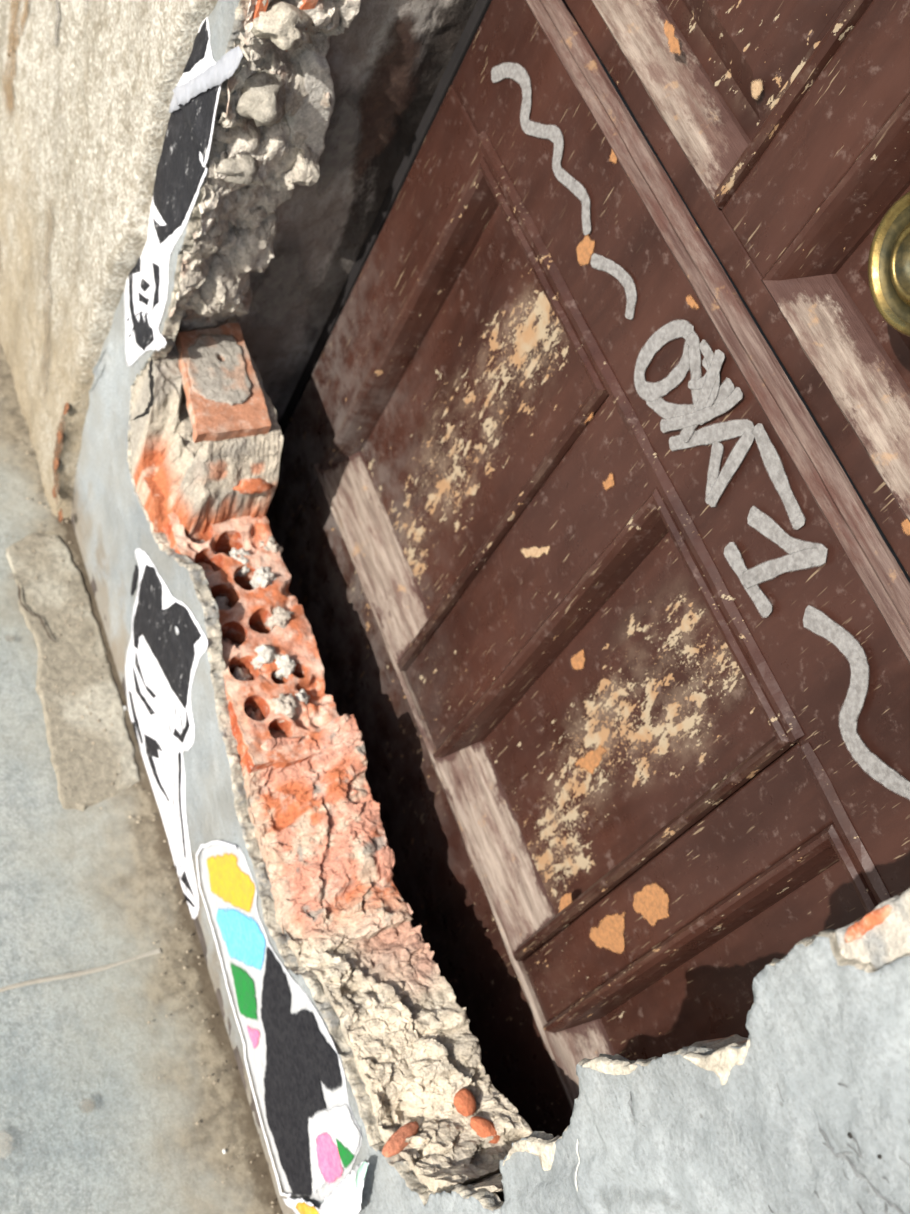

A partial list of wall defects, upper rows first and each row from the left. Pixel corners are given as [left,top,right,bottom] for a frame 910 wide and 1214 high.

peeling [664,20,681,54]
peeling [751,80,762,99]
peeling [576,234,595,265]
peeling [603,473,614,490]
spalling [129,0,557,1201]
peeling [571,650,585,670]
peeling [575,745,606,774]
peeling [559,893,572,912]
peeling [590,883,669,954]
flaking render [835,888,910,970]
flaking render [582,1057,638,1075]
flaking render [683,1039,750,1085]